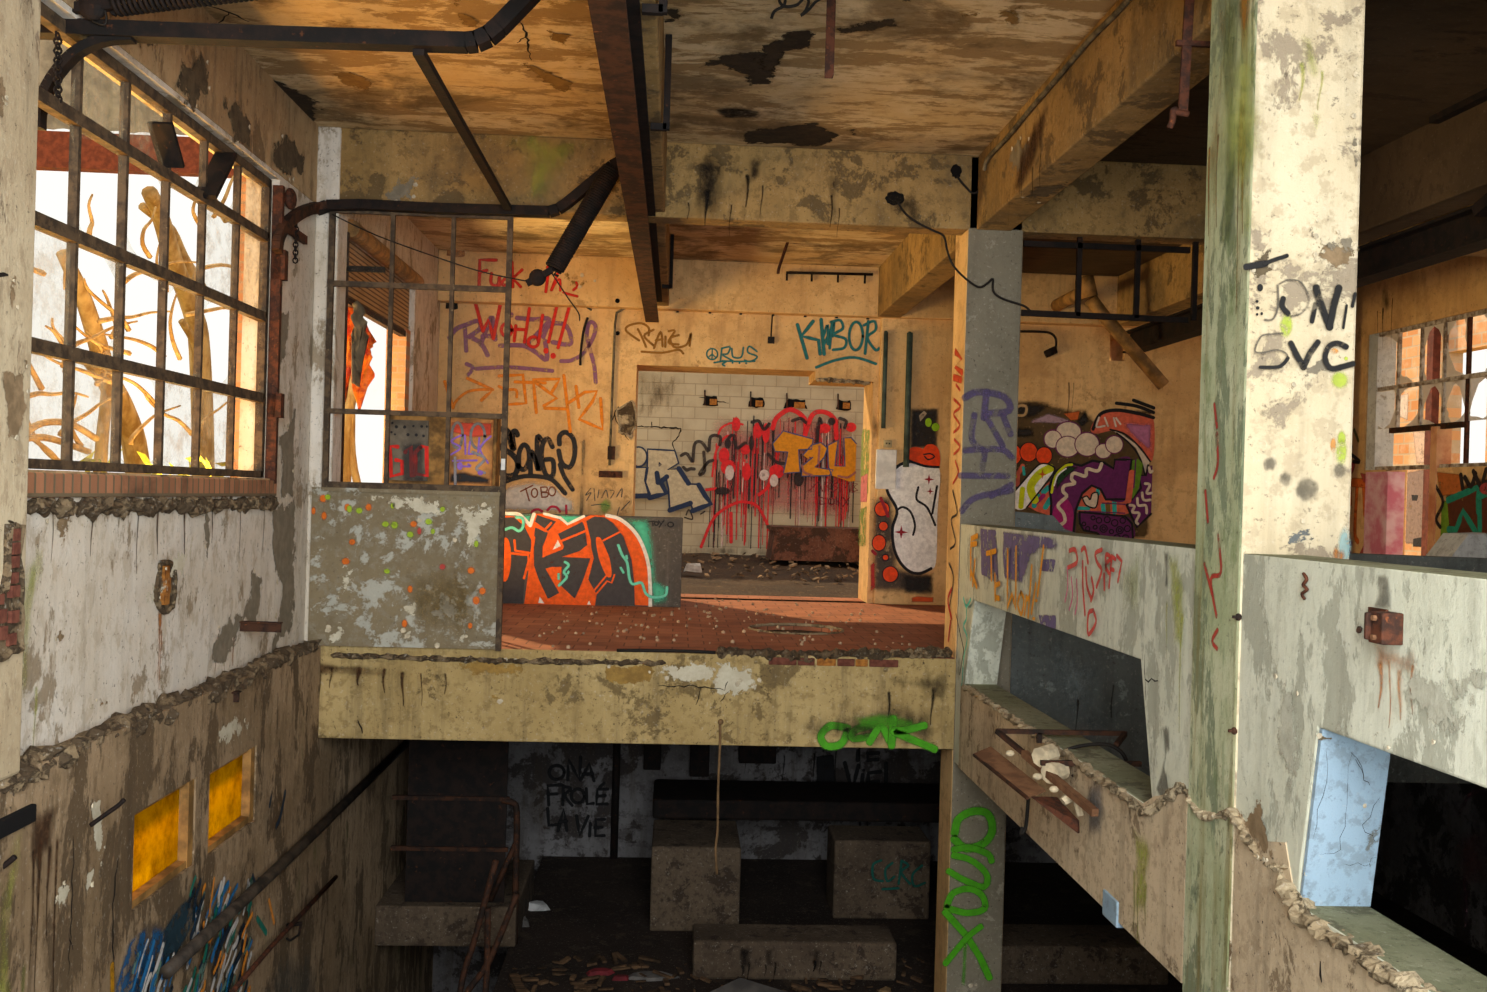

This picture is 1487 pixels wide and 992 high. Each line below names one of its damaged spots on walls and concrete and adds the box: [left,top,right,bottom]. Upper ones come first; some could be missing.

damp [699,30,816,86]
damp [719,109,855,146]
damp [687,159,719,220]
damp [729,162,763,236]
spalling [0,409,953,794]
damp [319,664,361,693]
damp [382,669,422,706]
damp [837,681,941,761]
rust [1378,653,1413,723]
peeling [55,800,106,908]
spalling [961,674,1441,992]
damp [22,812,58,992]